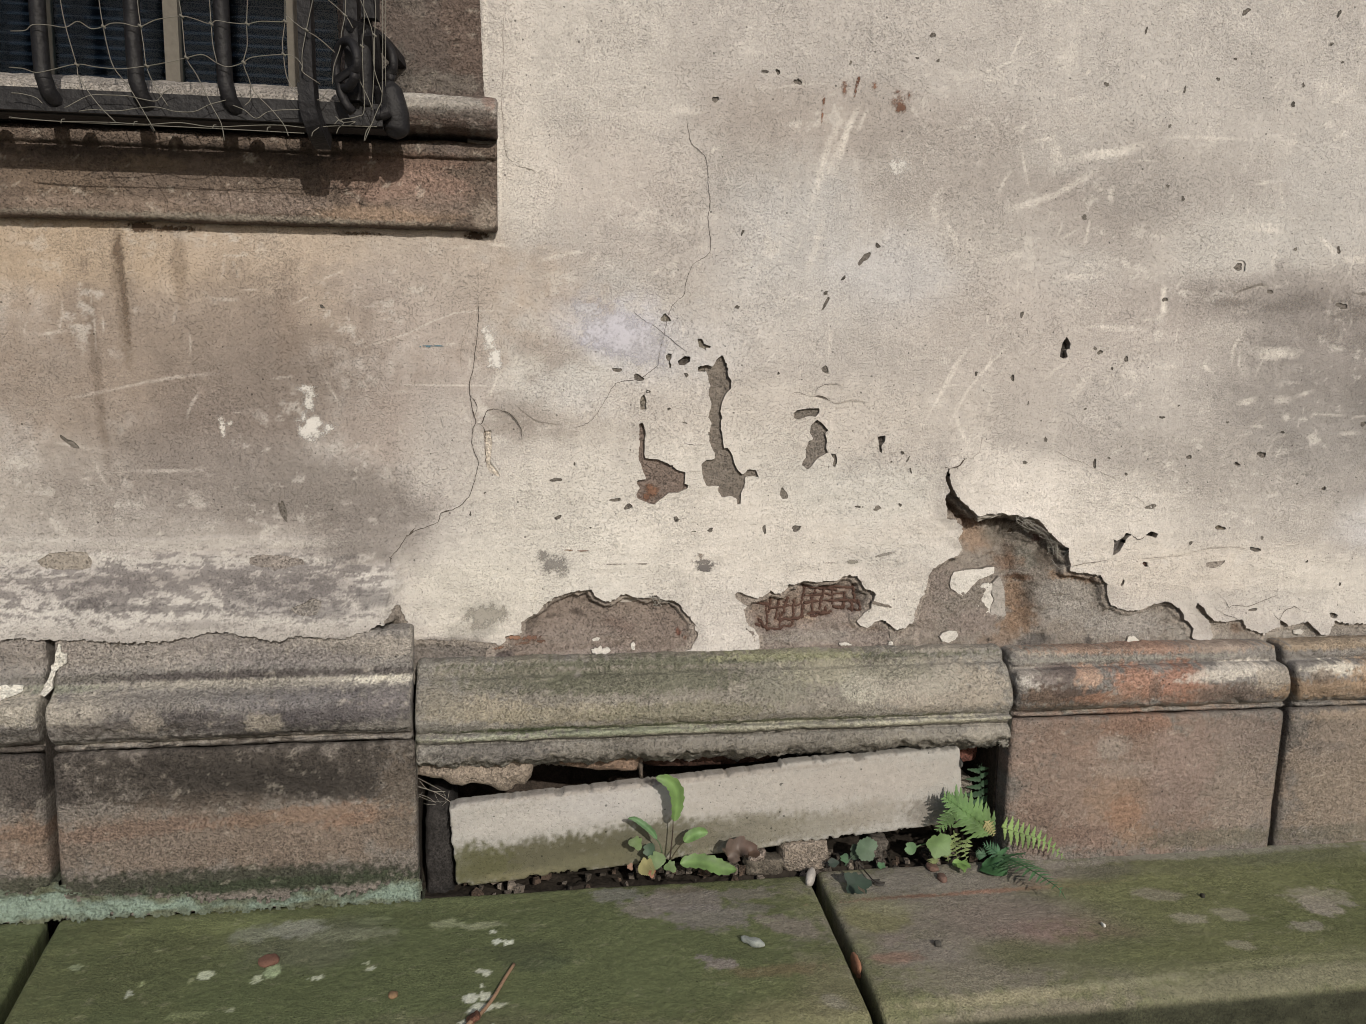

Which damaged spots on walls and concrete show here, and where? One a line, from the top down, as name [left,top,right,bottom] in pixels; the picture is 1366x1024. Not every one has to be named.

damp [113,222,195,343]
damp [464,231,489,240]
crack [389,116,711,567]
damp [297,385,334,441]
spalling [609,368,687,509]
spalling [666,339,758,504]
spalling [794,408,836,469]
spalling [384,605,408,624]
spalling [414,590,697,684]
corrosion [755,584,861,631]
spalling [735,473,1366,649]